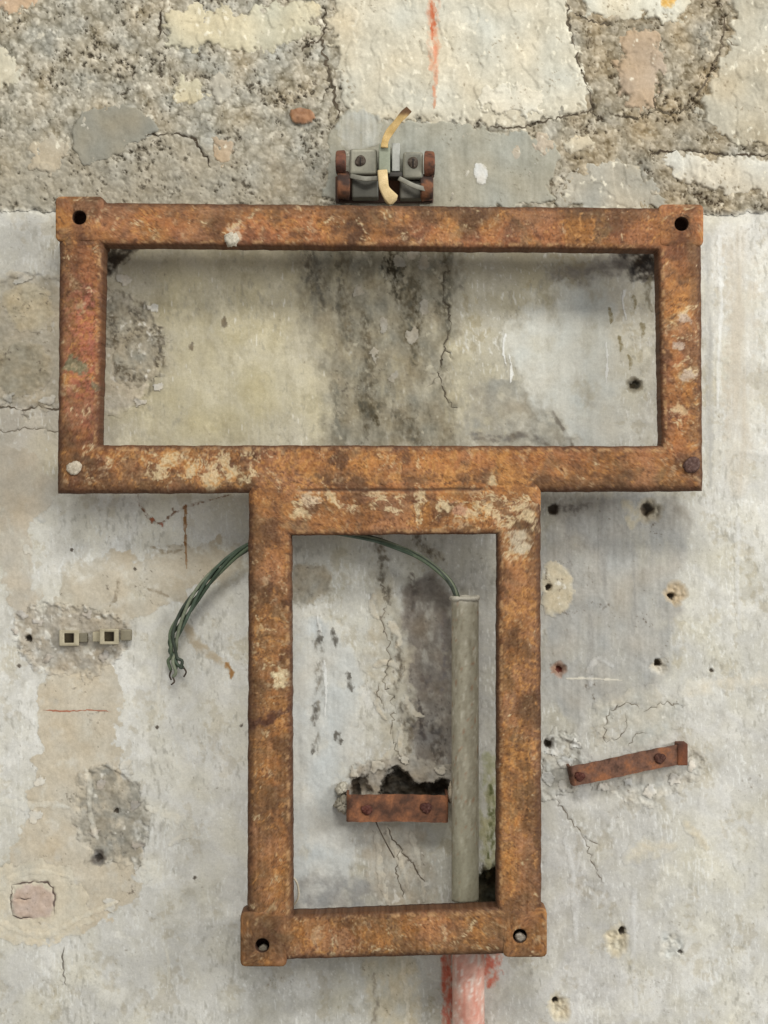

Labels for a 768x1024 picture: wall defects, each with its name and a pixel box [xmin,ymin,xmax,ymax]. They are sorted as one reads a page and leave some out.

spalling [0,0,768,216]
crack [0,405,59,433]
damp [284,250,575,446]
crack [437,268,458,408]
corrosion [136,494,232,569]
peeling [0,444,248,948]
corrosion [182,623,235,680]
peeling [292,561,452,882]
crack [376,578,405,763]
damp [398,571,453,764]
crack [603,701,684,746]
crack [387,827,424,896]